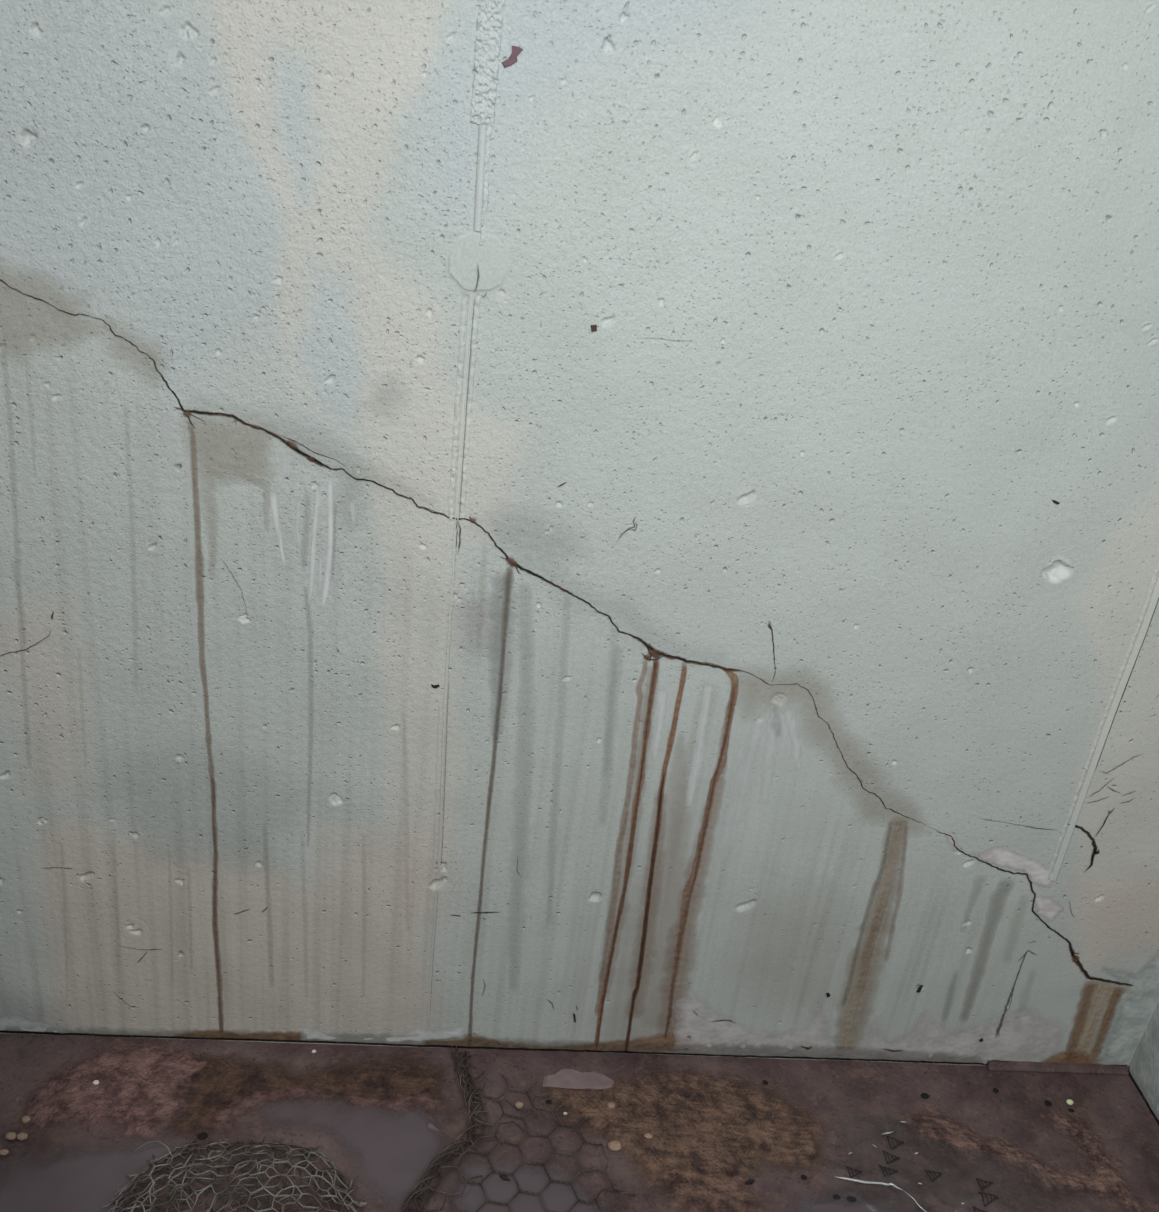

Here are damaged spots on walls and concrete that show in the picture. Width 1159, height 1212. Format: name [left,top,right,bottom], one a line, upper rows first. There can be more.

leakage [271,494,285,564]
leakage [296,481,333,606]
crack [0,279,1139,1034]
rust [177,427,301,1040]
rust [426,574,738,1051]
leakage [303,1029,462,1044]
rust [1045,986,1122,1064]